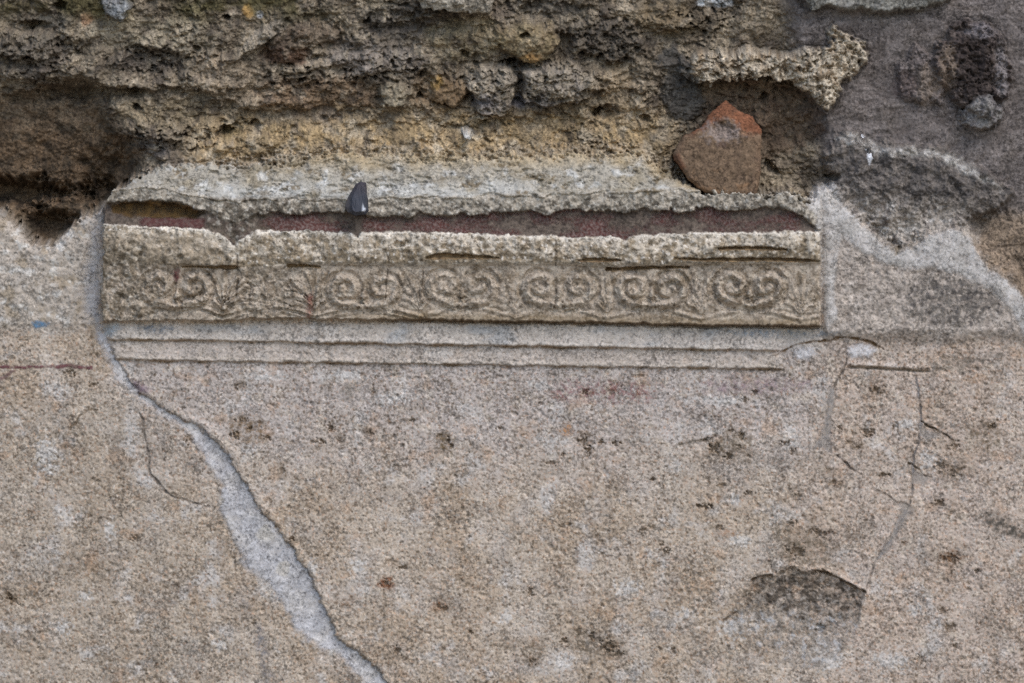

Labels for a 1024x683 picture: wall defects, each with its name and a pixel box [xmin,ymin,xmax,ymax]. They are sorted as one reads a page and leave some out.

peeling [141,218,205,228]
peeling [263,182,369,232]
peeling [561,207,799,239]
crack [85,214,387,683]
crack [783,337,877,470]
crack [871,377,953,574]
spalling [723,570,866,664]